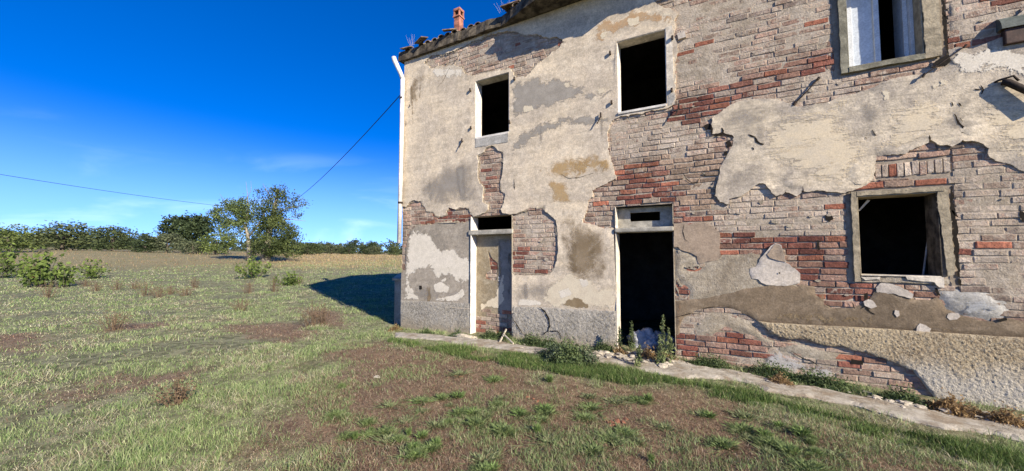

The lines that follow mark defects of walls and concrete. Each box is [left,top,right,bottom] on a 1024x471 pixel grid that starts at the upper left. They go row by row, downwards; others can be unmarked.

spalling [424,32,611,117]
peeling [401,145,615,336]
damp [566,230,605,278]
spalling [583,0,1024,396]
crack [512,307,562,339]